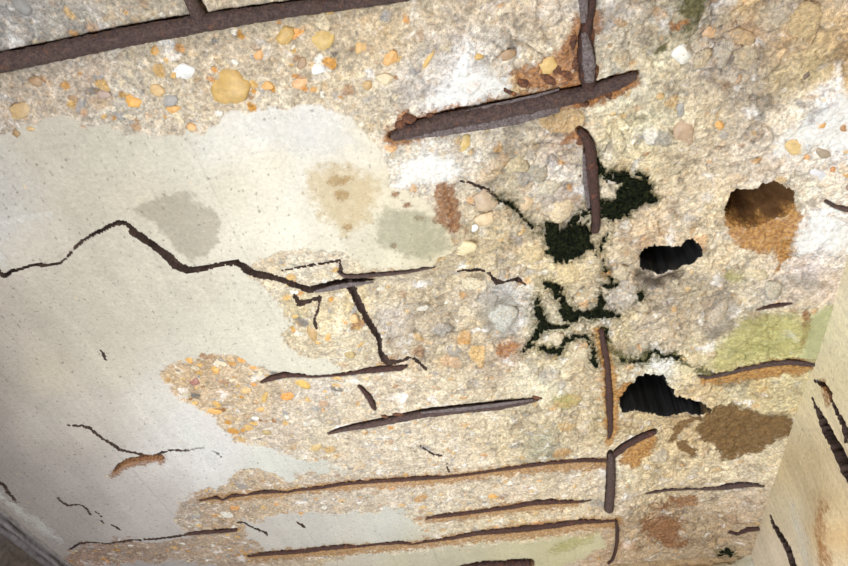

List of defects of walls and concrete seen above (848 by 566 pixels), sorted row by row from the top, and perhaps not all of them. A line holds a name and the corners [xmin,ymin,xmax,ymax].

spalling [0,0,190,53]
corrosion [383,0,640,146]
crack [0,220,427,371]
spalling [251,247,415,286]
spalling [486,303,519,333]
crack [67,424,222,471]
corrosion [196,326,632,504]
corrosion [619,436,658,469]
crack [811,378,848,483]
spalling [64,468,367,566]
corrosion [245,498,623,563]
crack [770,514,797,566]